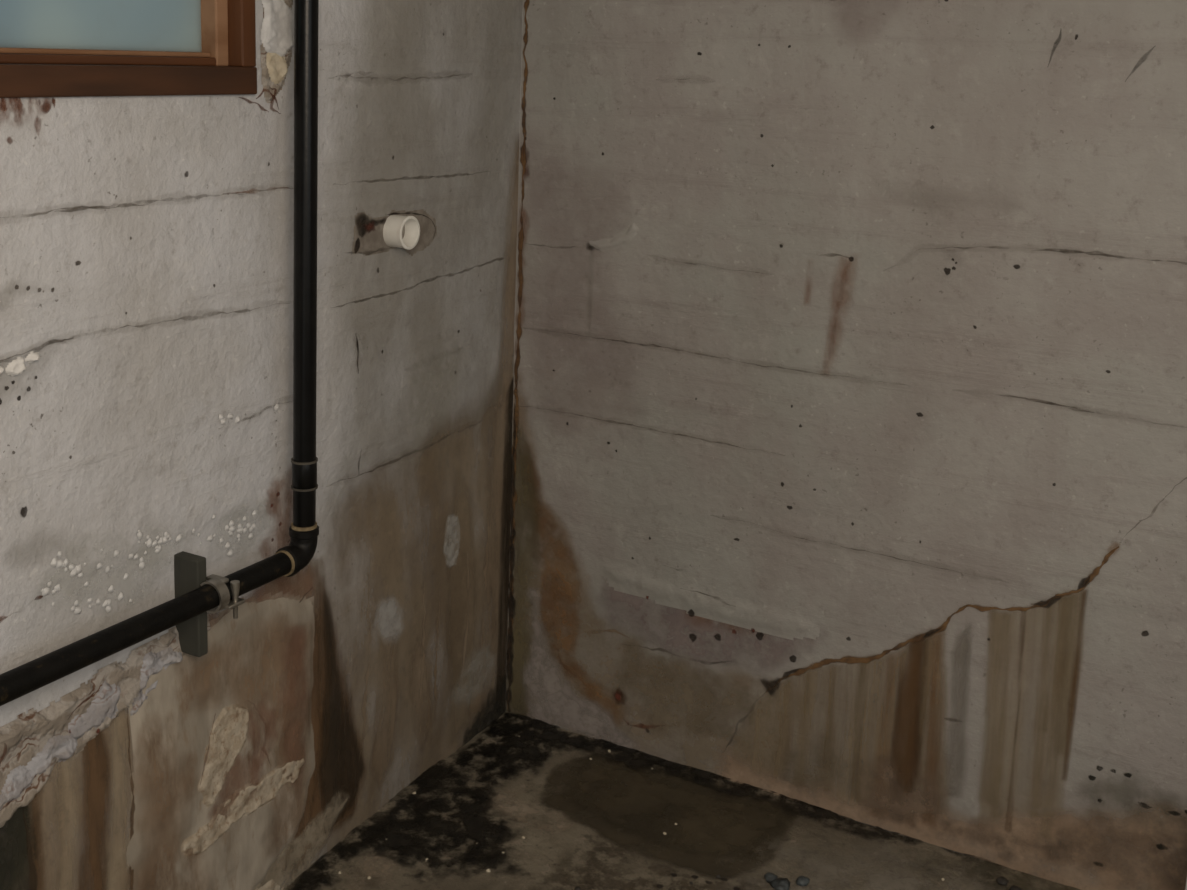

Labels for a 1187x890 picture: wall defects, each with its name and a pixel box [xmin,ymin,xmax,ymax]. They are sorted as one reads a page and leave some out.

corrosion [0,97,55,130]
peeling [239,0,294,114]
crack [63,205,101,213]
crack [366,174,468,182]
crack [355,278,436,303]
crack [463,0,564,712]
leakage [254,144,1187,890]
peeling [0,575,315,890]
leakage [0,709,135,890]